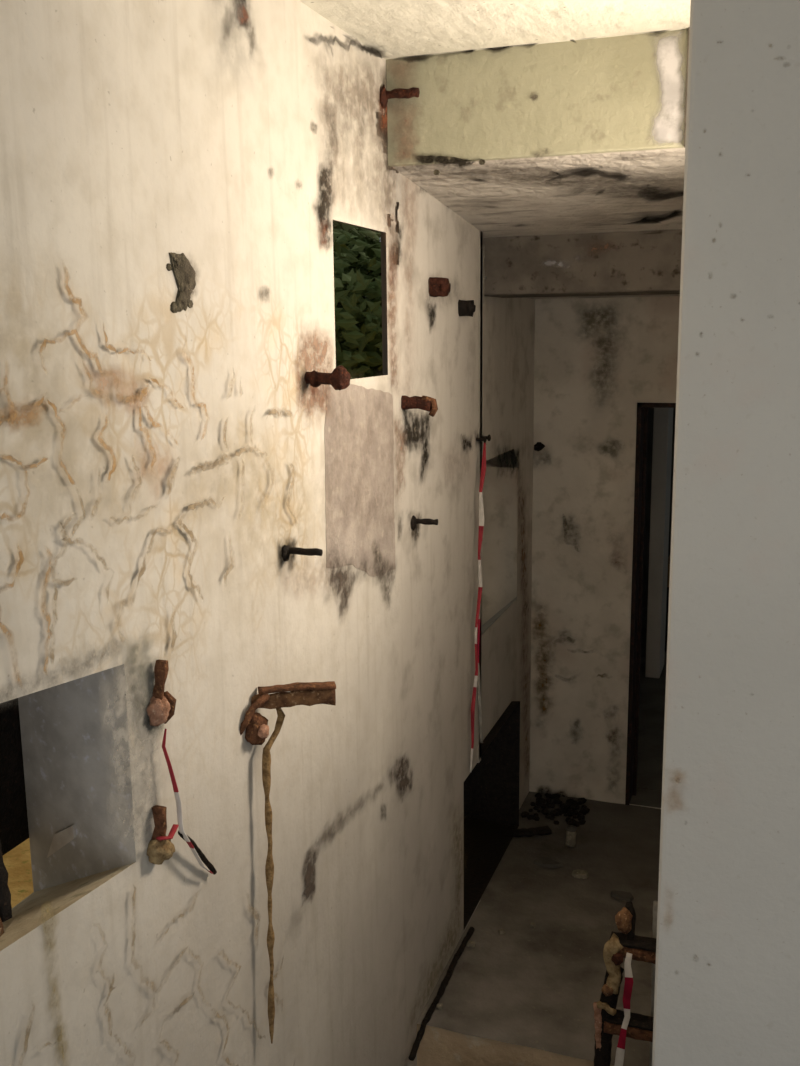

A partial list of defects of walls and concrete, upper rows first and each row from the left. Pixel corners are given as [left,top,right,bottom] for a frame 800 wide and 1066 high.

damp [226,0,254,47]
damp [317,169,332,244]
spalling [166,252,197,313]
crack [0,272,291,672]
damp [396,412,430,478]
crack [130,888,138,954]
crack [23,1026,51,1053]
crack [101,962,130,1054]